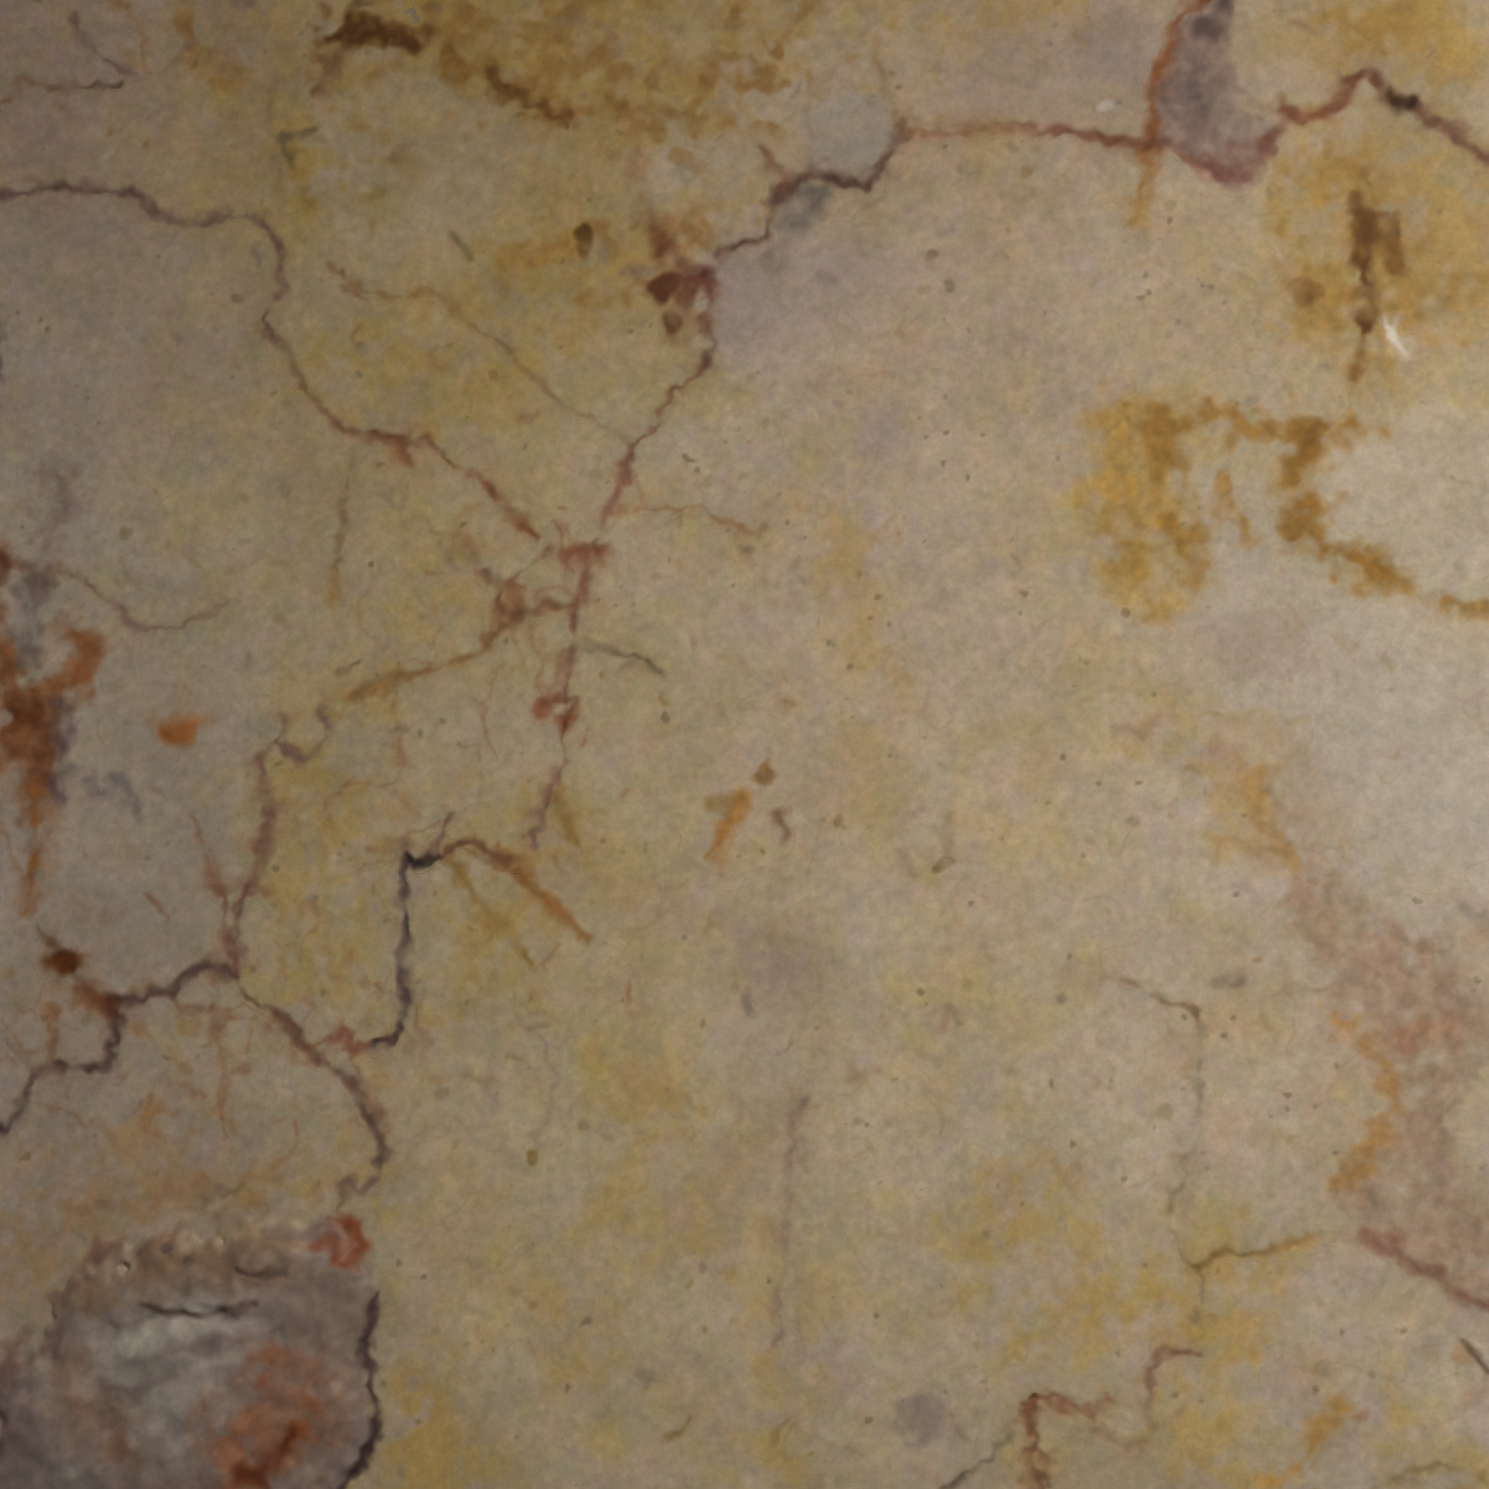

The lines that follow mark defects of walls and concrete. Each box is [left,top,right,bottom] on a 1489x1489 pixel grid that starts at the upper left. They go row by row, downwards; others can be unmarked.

crack [0,0,156,118]
damp [1129,0,1304,197]
crack [1272,61,1489,173]
damp [1046,369,1489,648]
corrosion [0,446,132,924]
corrosion [138,672,220,754]
crack [0,49,1172,1209]
crack [1451,894,1489,941]
crack [761,1089,814,1359]
crack [936,966,1339,1489]
crack [1364,1458,1489,1489]